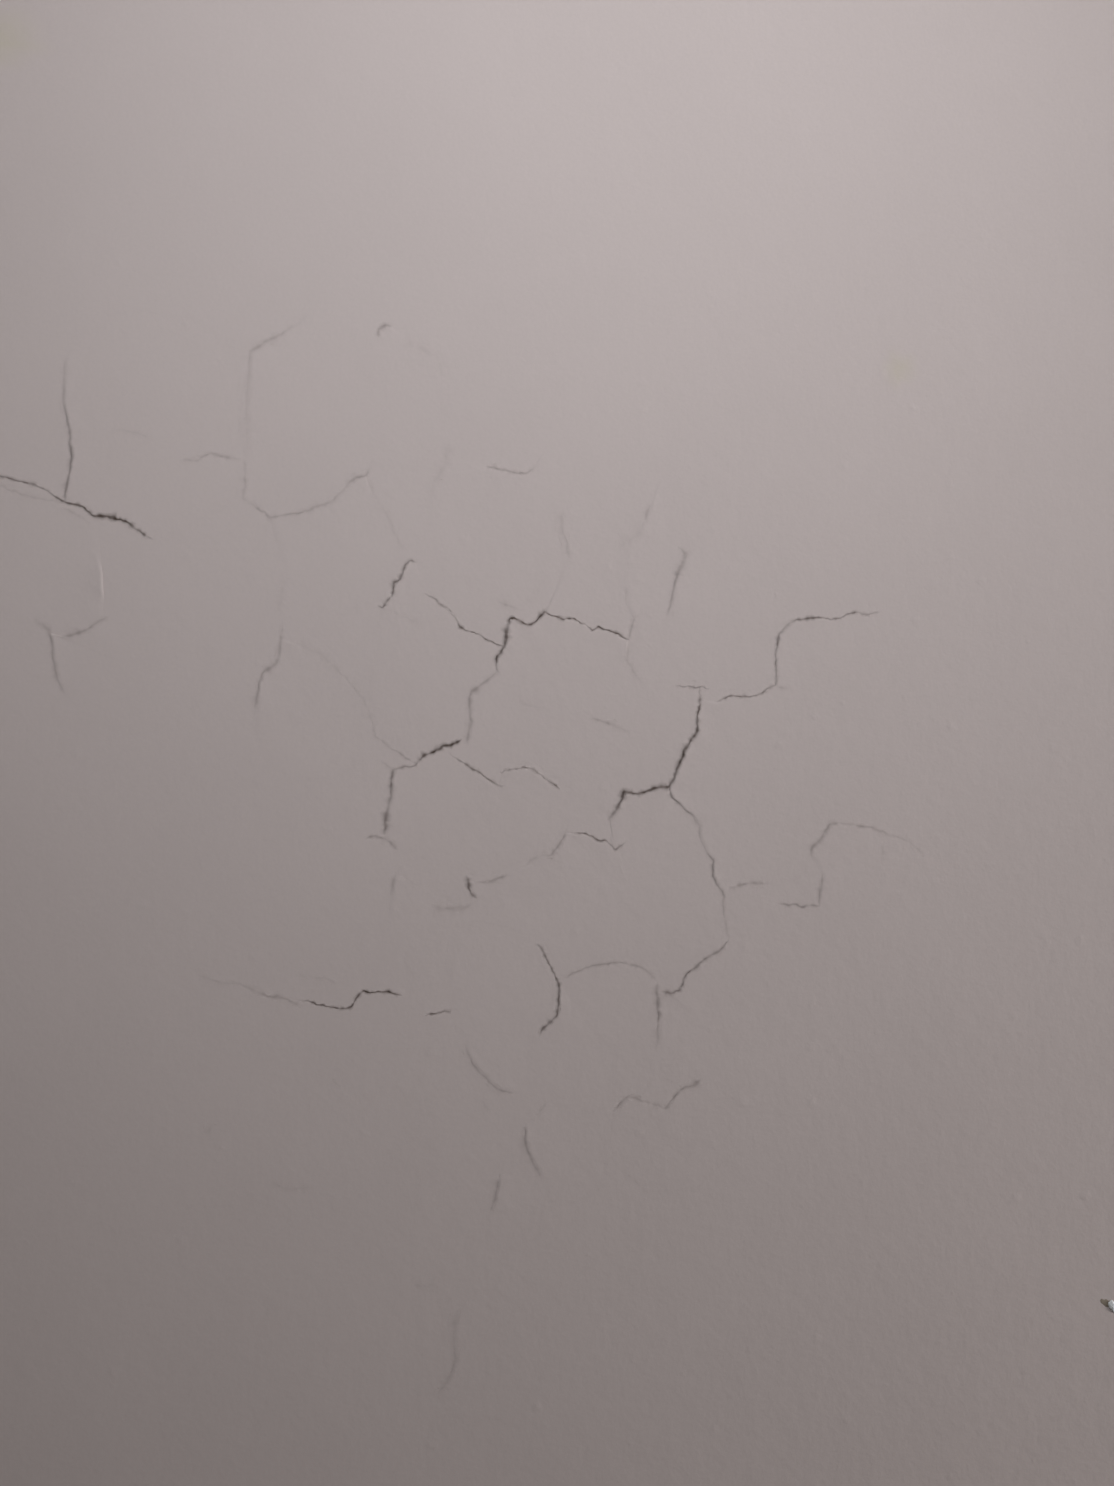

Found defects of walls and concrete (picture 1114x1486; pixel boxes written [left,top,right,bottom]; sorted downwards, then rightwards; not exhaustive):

crack [61,500,144,535]
crack [460,614,619,661]
crack [423,741,459,757]
crack [622,708,700,798]